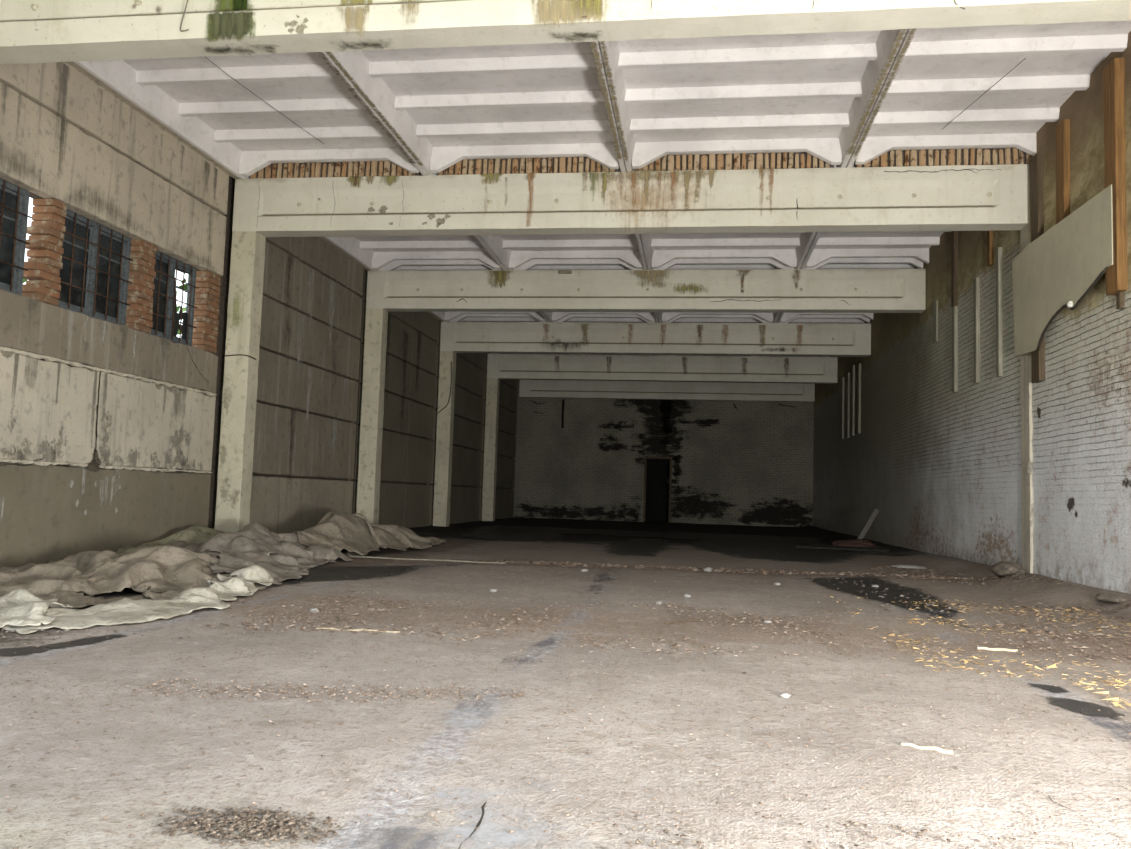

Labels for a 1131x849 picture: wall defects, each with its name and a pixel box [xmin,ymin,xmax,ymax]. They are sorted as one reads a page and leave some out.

water stain [214,0,249,11]
water stain [341,0,381,48]
water stain [532,0,602,40]
corrosion [583,41,716,212]
water stain [665,455,813,527]
crack [458,802,486,849]